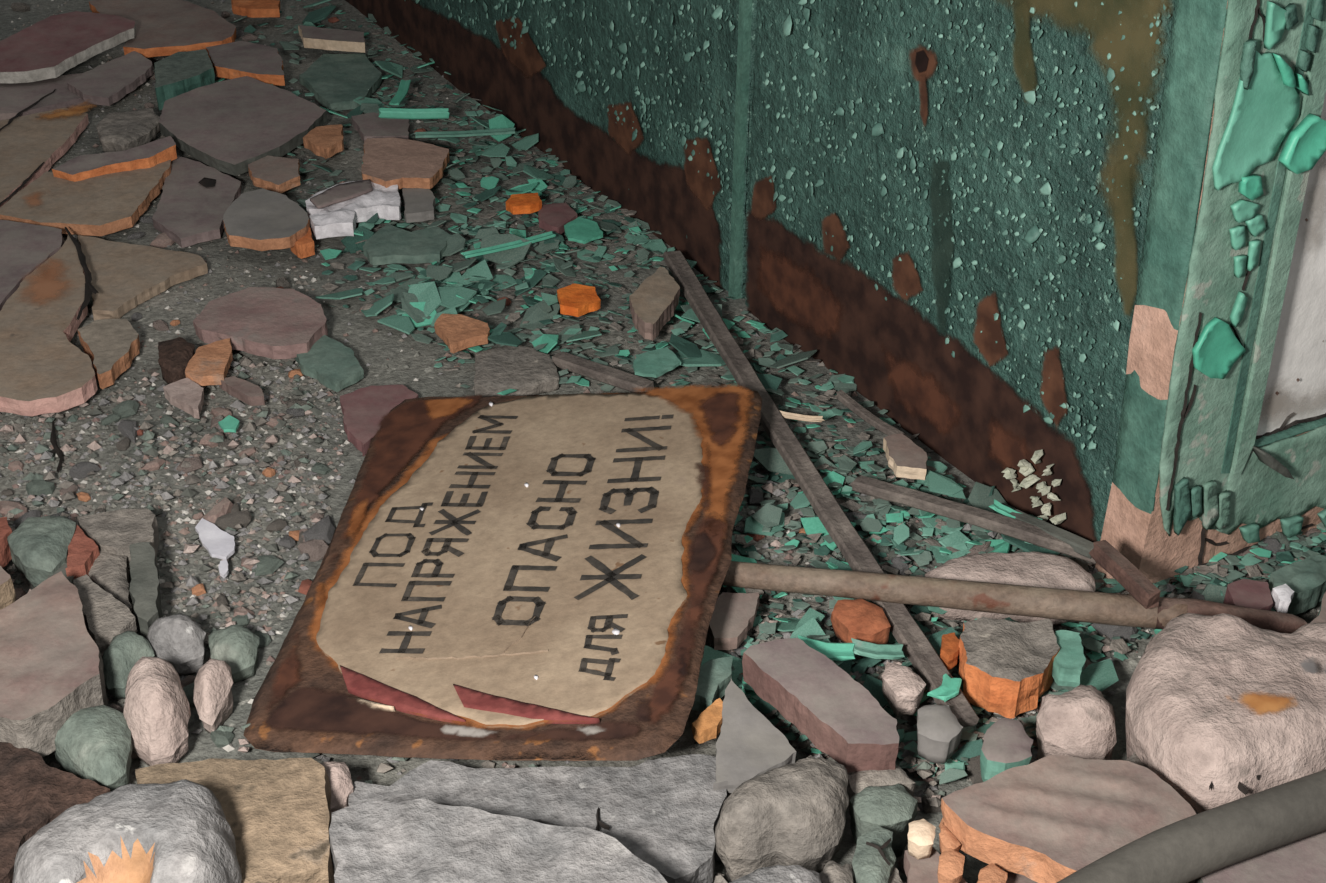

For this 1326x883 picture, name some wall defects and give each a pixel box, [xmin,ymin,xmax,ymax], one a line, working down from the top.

corrosion [345,0,722,289]
corrosion [909,47,937,125]
peeling [760,0,1171,450]
crack [1248,0,1266,43]
peeling [1192,0,1326,379]
corrosion [746,176,1096,542]
crack [1166,312,1243,511]
peeling [1173,477,1260,544]
peeling [1252,446,1294,479]
peeling [1280,508,1326,538]